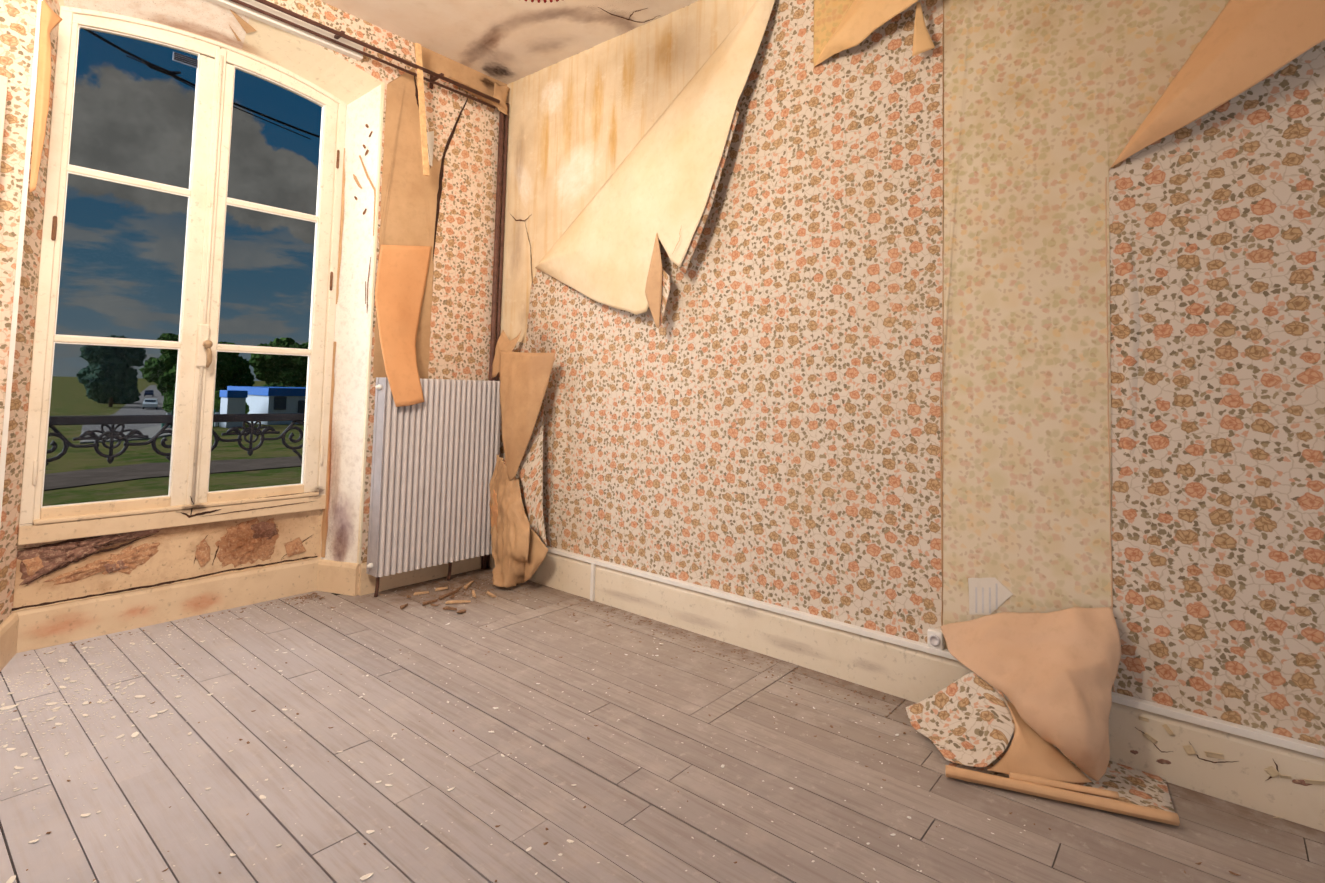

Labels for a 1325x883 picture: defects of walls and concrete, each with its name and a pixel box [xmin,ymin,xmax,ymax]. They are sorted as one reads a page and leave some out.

peeling [813,0,854,66]
water stain [482,68,508,86]
peeling [378,0,756,379]
peeling [373,311,387,378]
peeling [941,0,1229,649]
spalling [17,528,164,586]
peeling [1130,716,1237,764]
peeling [1264,760,1325,786]